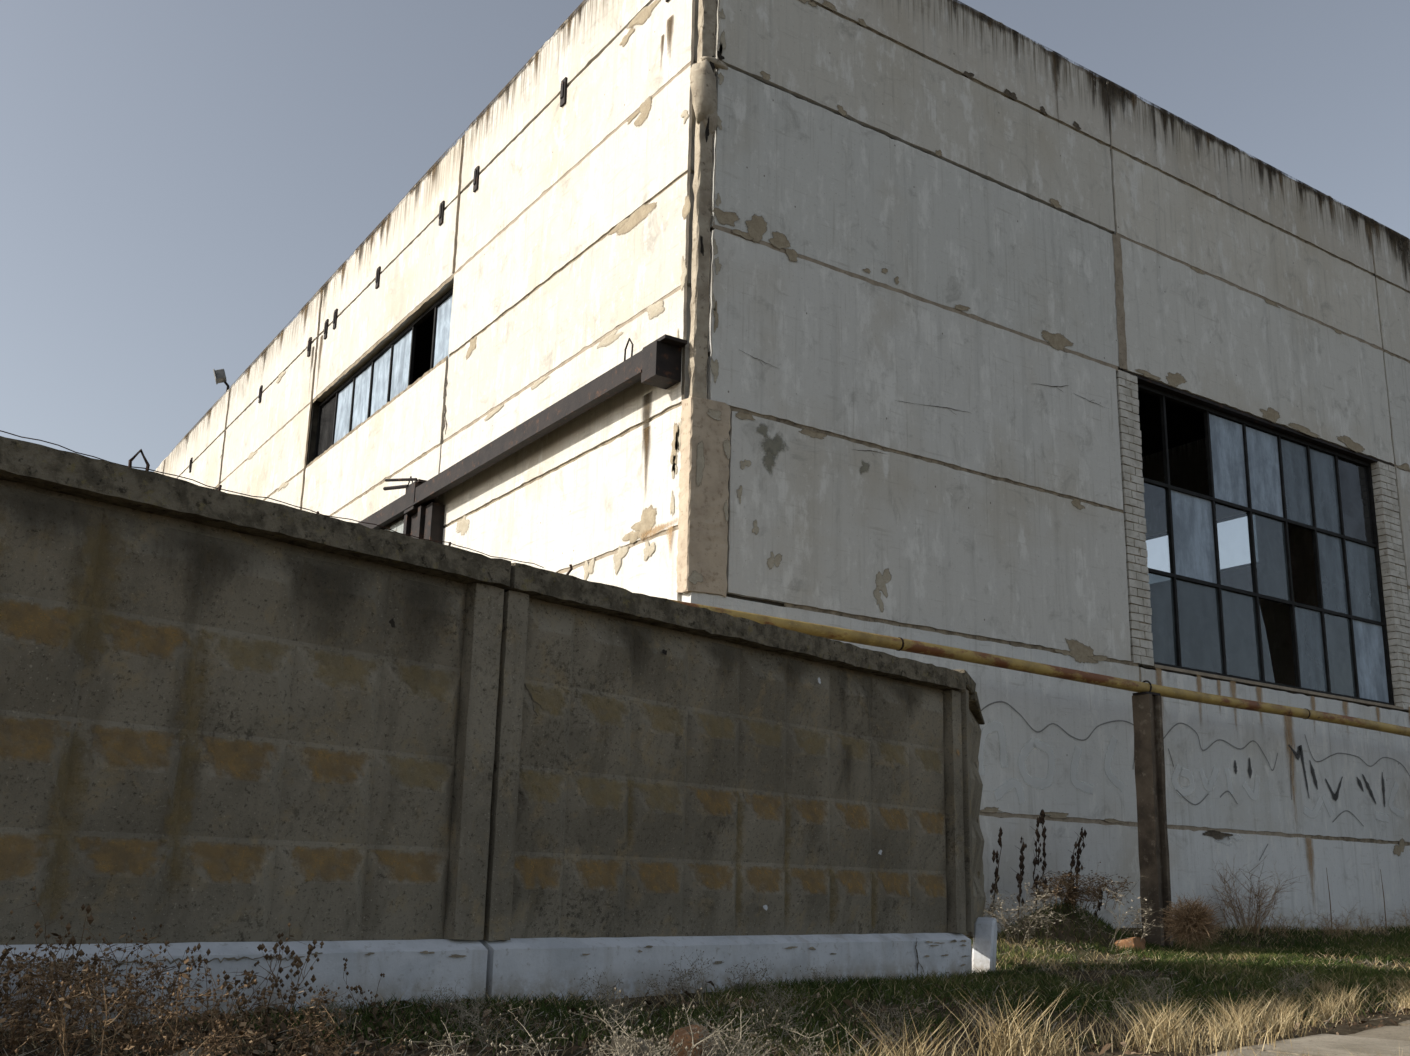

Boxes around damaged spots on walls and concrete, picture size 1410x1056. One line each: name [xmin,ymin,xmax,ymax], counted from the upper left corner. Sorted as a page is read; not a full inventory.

spalling [709,9,726,85]
water stain [953,0,1410,281]
water stain [176,0,587,446]
spalling [609,203,657,236]
spalling [680,193,798,291]
spalling [646,300,664,319]
spalling [597,330,623,349]
spalling [1041,330,1074,350]
spalling [613,421,682,574]
spalling [874,569,892,612]
spalling [1055,638,1108,663]